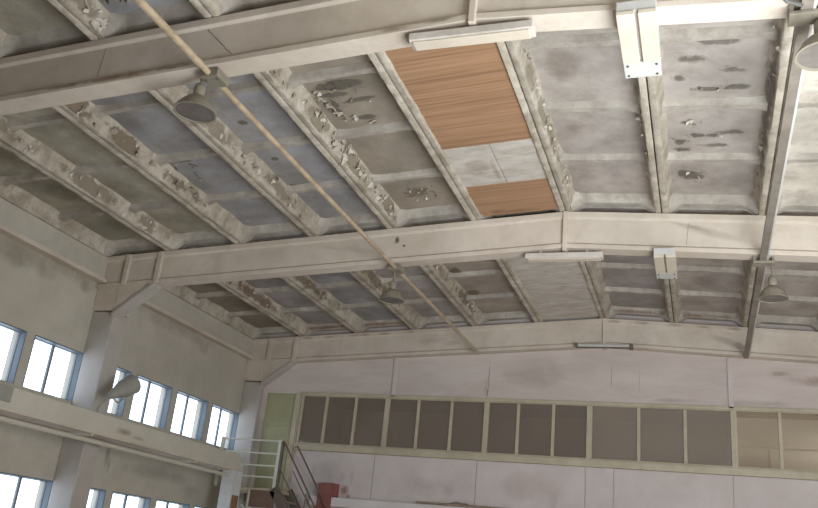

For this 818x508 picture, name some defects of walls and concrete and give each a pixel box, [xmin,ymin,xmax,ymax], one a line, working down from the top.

peeling [77,0,131,34]
peeling [67,101,139,156]
peeling [233,145,307,218]
peeling [270,69,397,221]